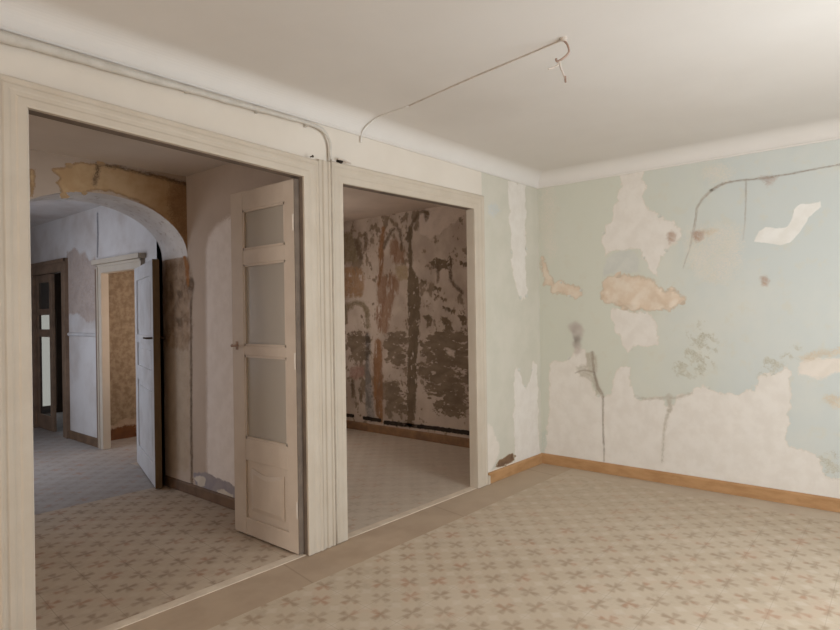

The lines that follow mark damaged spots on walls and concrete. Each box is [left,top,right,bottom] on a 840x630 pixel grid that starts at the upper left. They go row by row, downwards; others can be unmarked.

peeling [52,161,187,249]
peeling [508,181,529,300]
peeling [601,171,682,276]
peeling [610,307,660,353]
flaking render [163,336,235,498]
crack [577,351,605,461]
peeling [487,346,840,499]